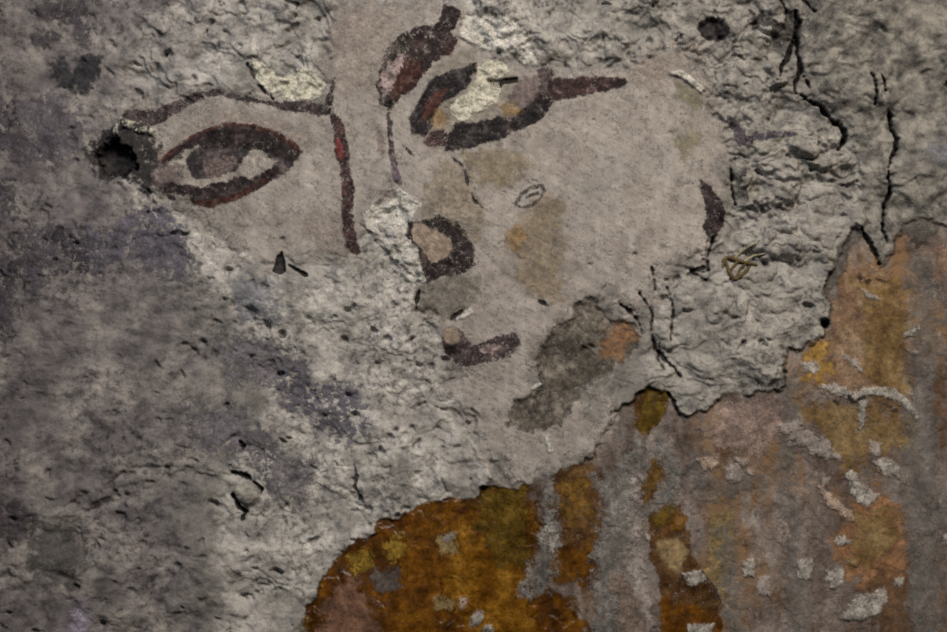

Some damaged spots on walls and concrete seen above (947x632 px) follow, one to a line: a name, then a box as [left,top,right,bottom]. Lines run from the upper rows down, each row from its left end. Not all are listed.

crack [779,0,848,151]
crack [690,237,714,281]
crack [729,169,737,206]
crack [859,73,899,284]
crack [619,268,682,416]
spalling [507,218,947,632]